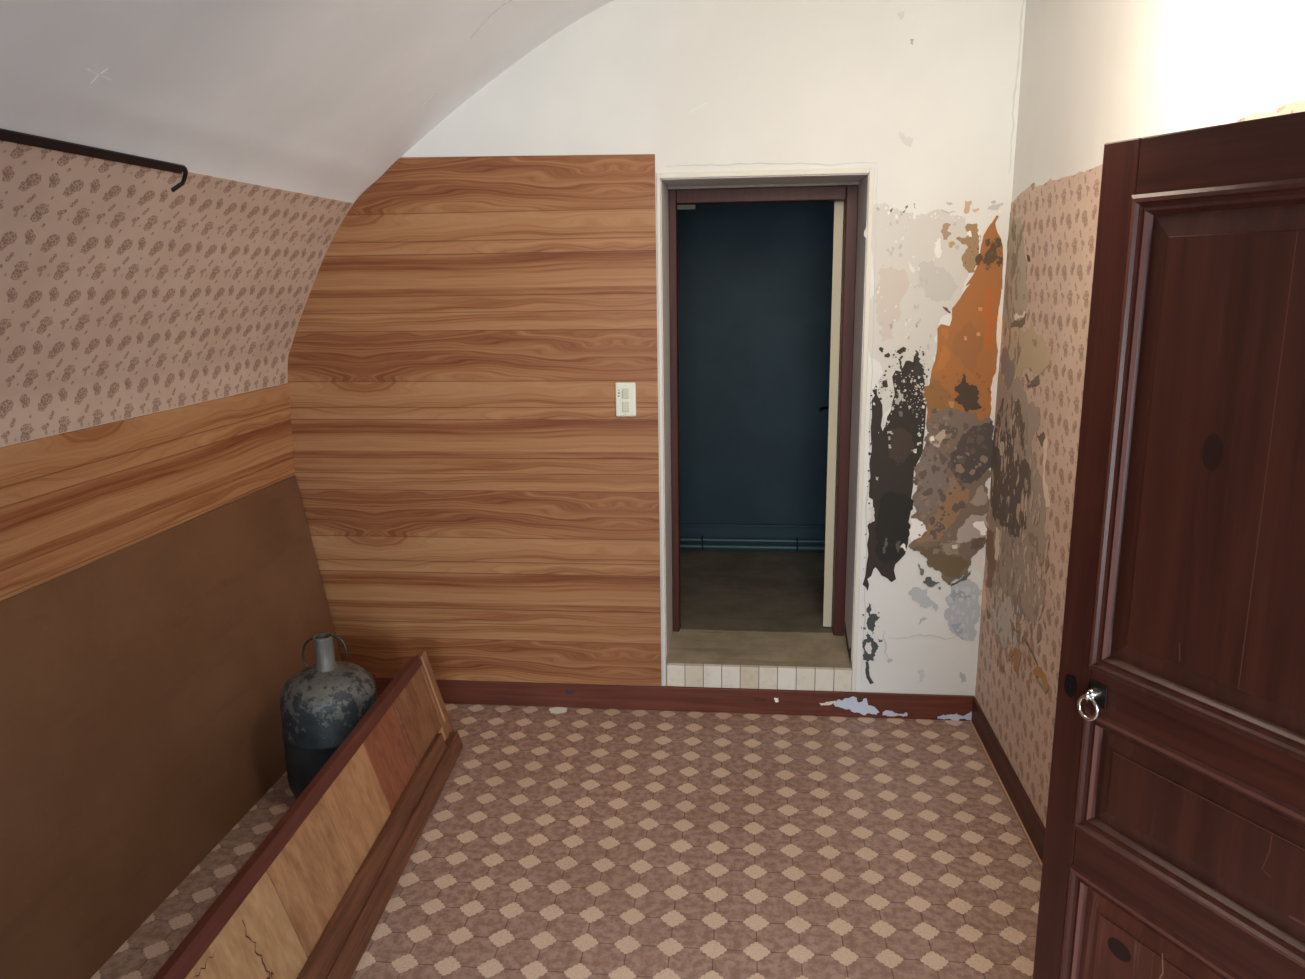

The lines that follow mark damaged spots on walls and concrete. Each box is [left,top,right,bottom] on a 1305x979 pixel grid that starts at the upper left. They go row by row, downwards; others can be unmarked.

peeling [864,200,1003,453]
damp [861,212,1054,695]
peeling [883,518,927,554]
peeling [918,485,987,589]
peeling [844,625,872,664]
peeling [820,696,908,717]
peeling [937,712,972,721]